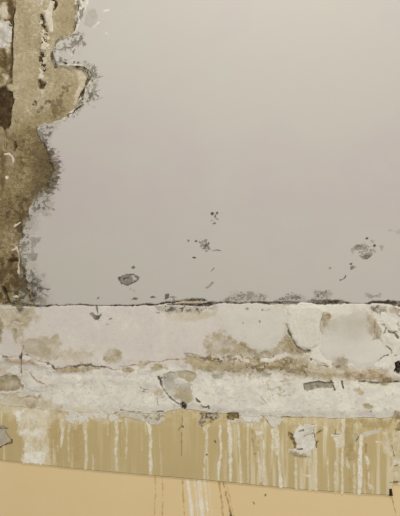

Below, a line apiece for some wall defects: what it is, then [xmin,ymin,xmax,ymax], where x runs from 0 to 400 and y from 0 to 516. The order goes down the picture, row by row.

spalling [0,0,92,306]
leakage [0,125,82,364]
crack [46,362,111,370]
crack [143,376,210,409]
crack [111,299,349,307]
leakage [185,323,398,390]
peeling [286,305,342,367]
crack [366,300,400,316]
peeling [368,312,400,370]
leakage [0,397,108,469]
spalling [288,417,322,457]
leakage [294,417,392,494]